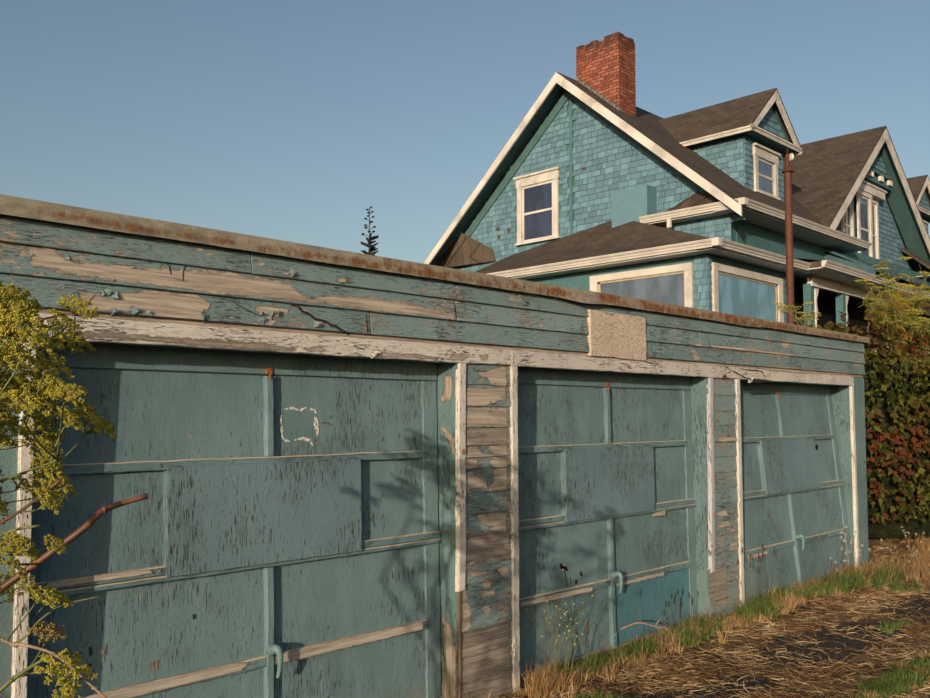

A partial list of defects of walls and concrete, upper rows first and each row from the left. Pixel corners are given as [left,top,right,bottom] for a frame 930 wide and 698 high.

peeling [24,243,455,326]
rust [642,300,807,334]
peeling [73,330,325,352]
peeling [707,567,728,606]